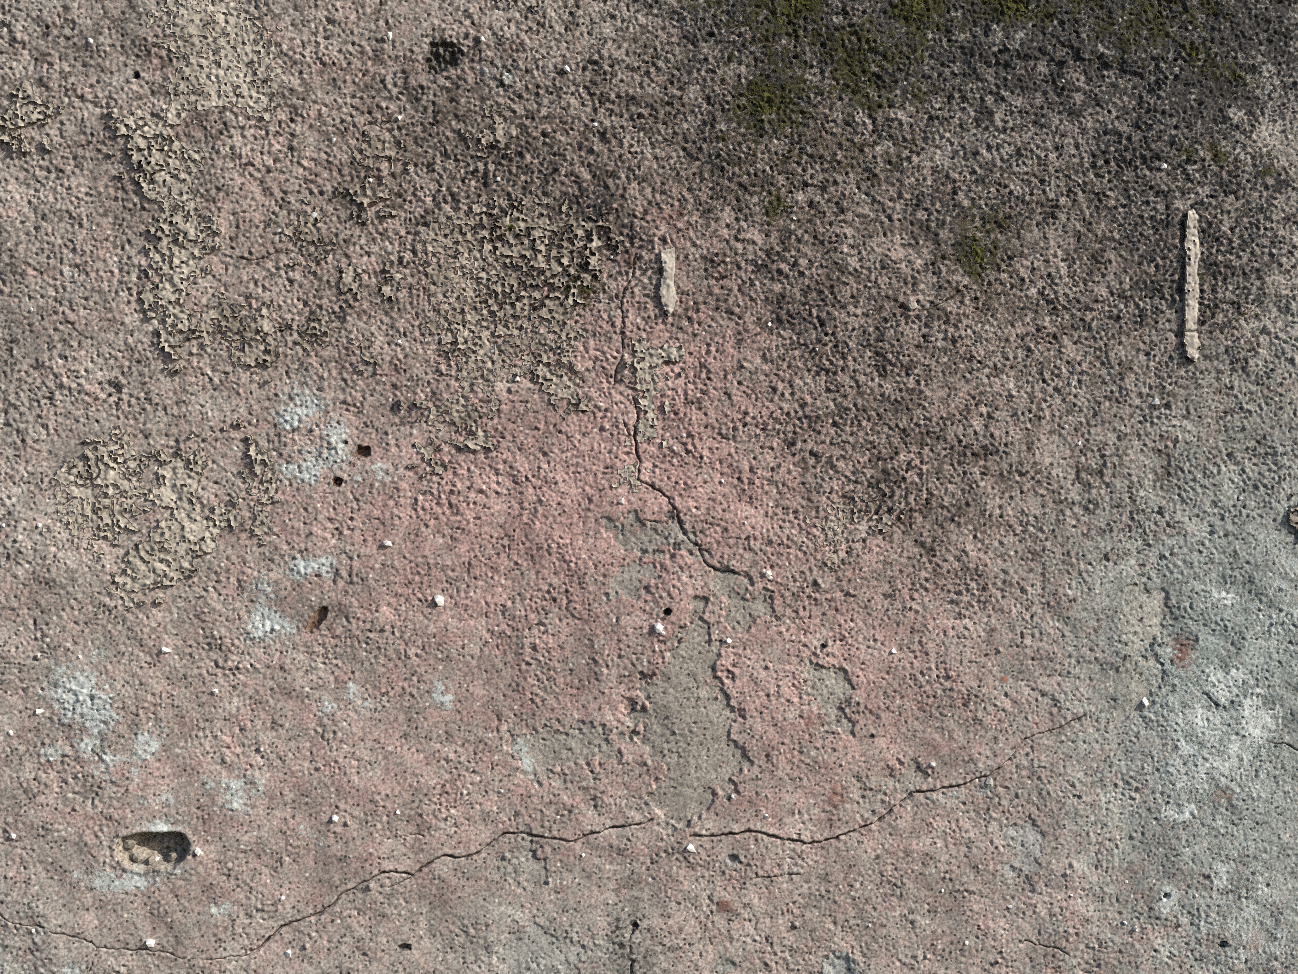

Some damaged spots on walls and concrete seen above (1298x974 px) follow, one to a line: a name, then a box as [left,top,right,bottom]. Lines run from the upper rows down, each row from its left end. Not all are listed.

peeling [109,0,331,382]
peeling [336,116,412,222]
spalling [424,40,463,75]
peeling [461,102,518,158]
damp [248,276,368,347]
peeling [269,177,625,477]
damp [355,0,1298,608]
crack [581,255,737,574]
peeling [53,420,282,609]
crack [689,715,1084,844]
crack [0,819,652,972]